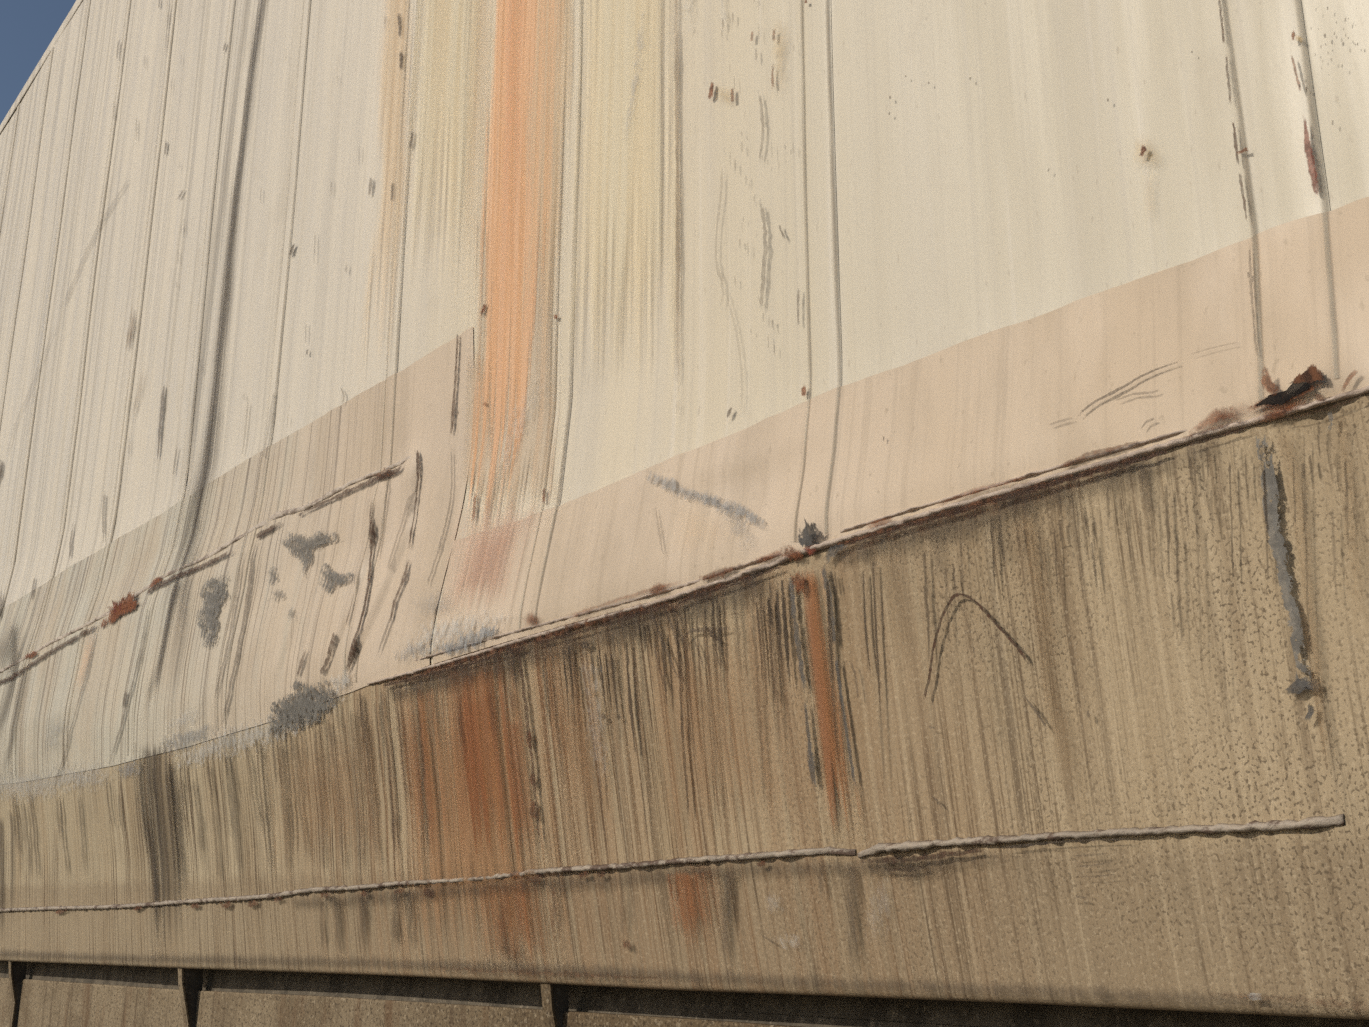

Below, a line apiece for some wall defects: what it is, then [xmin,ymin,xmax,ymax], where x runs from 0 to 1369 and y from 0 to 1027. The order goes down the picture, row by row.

corrosion [1304,121,1318,194]
corrosion [470,0,568,517]
corrosion [1187,409,1234,437]
corrosion [101,592,137,628]
damp [562,578,790,811]
damp [827,572,837,672]
damp [863,563,880,700]
corrosion [760,442,1135,825]
damp [1229,457,1268,574]
peeling [1251,368,1333,720]
damp [139,751,180,921]